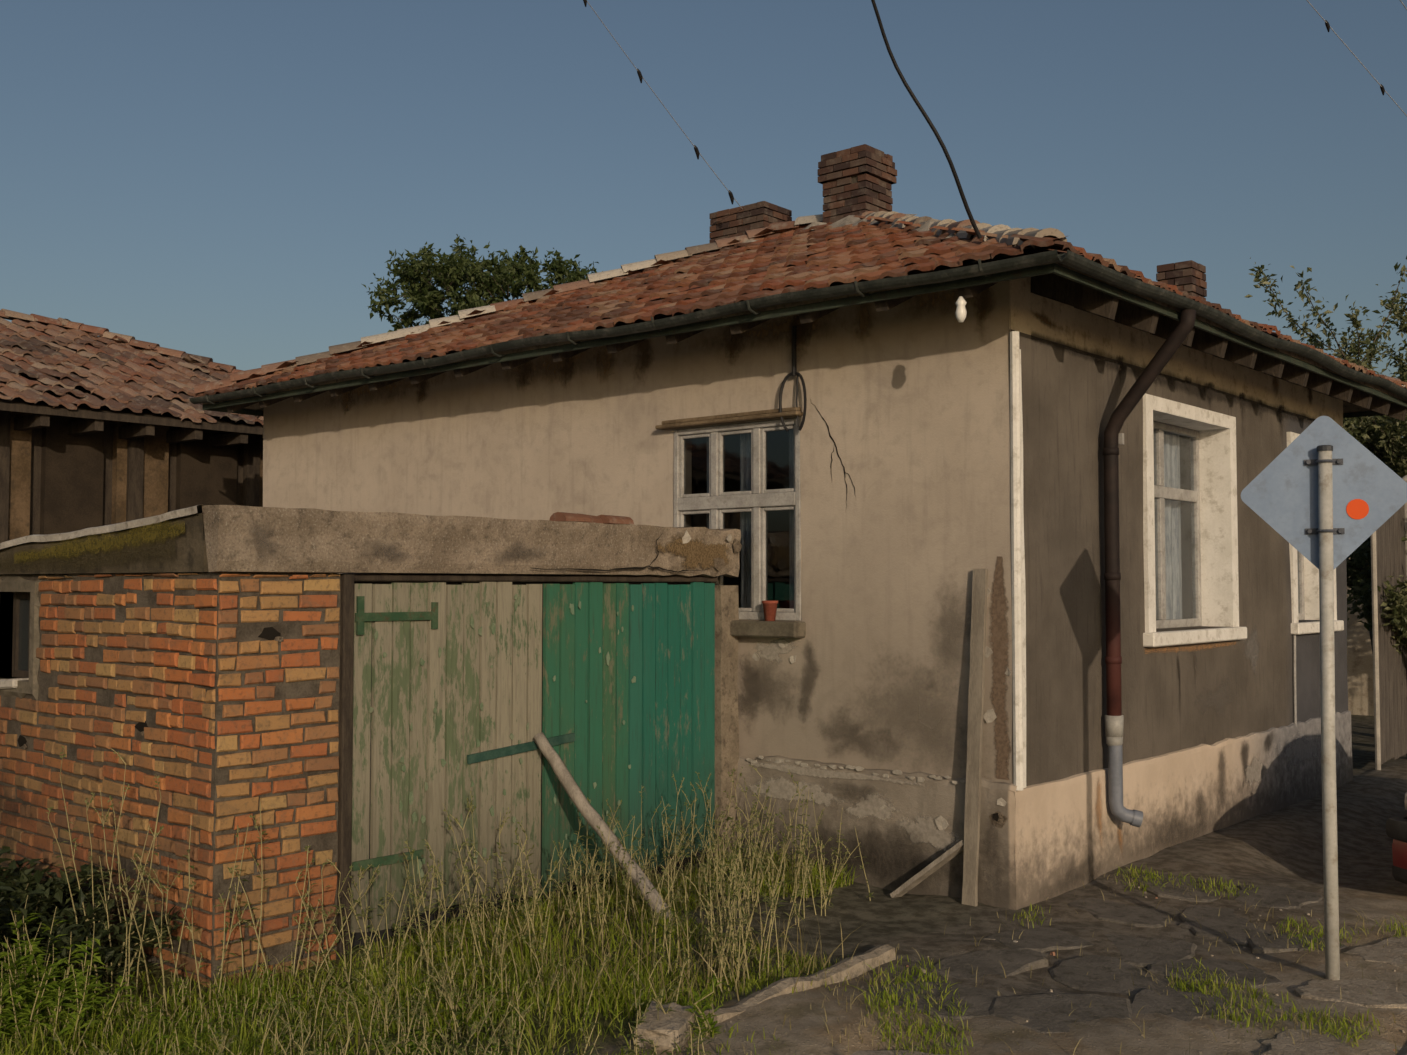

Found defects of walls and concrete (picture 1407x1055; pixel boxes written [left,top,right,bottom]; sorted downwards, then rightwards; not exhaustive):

leakage [915,290,959,311]
leakage [744,667,775,710]
leakage [801,648,817,713]
spalling [740,756,965,851]
leakage [1156,754,1225,845]